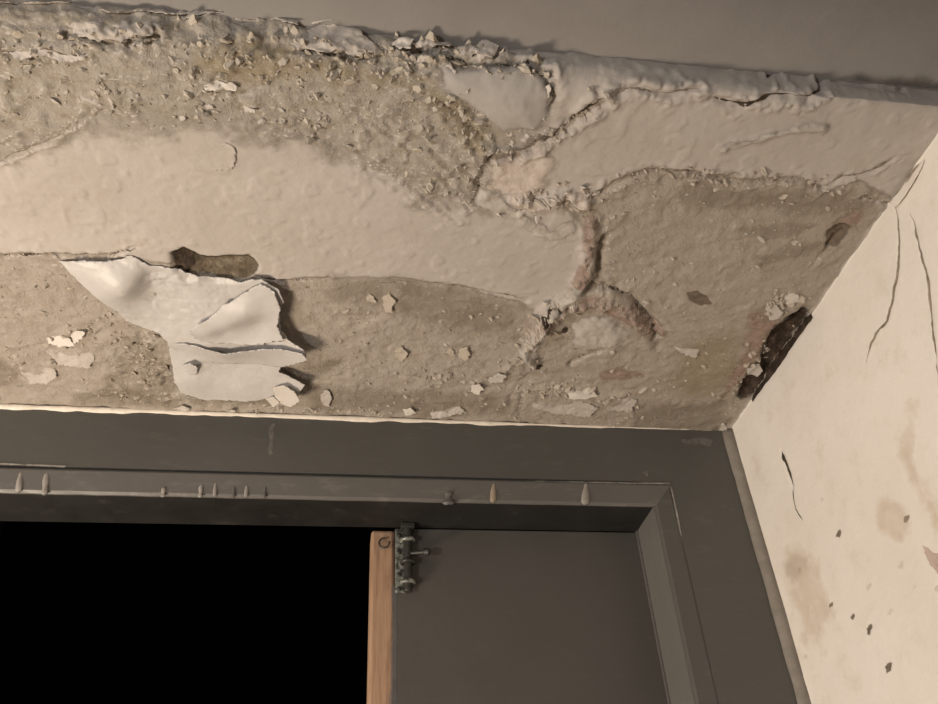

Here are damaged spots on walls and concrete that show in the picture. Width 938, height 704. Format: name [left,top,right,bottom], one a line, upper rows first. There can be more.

peeling [0,0,891,431]
crack [593,235,658,331]
crack [866,160,938,372]
crack [782,452,803,520]
peeling [924,547,938,573]